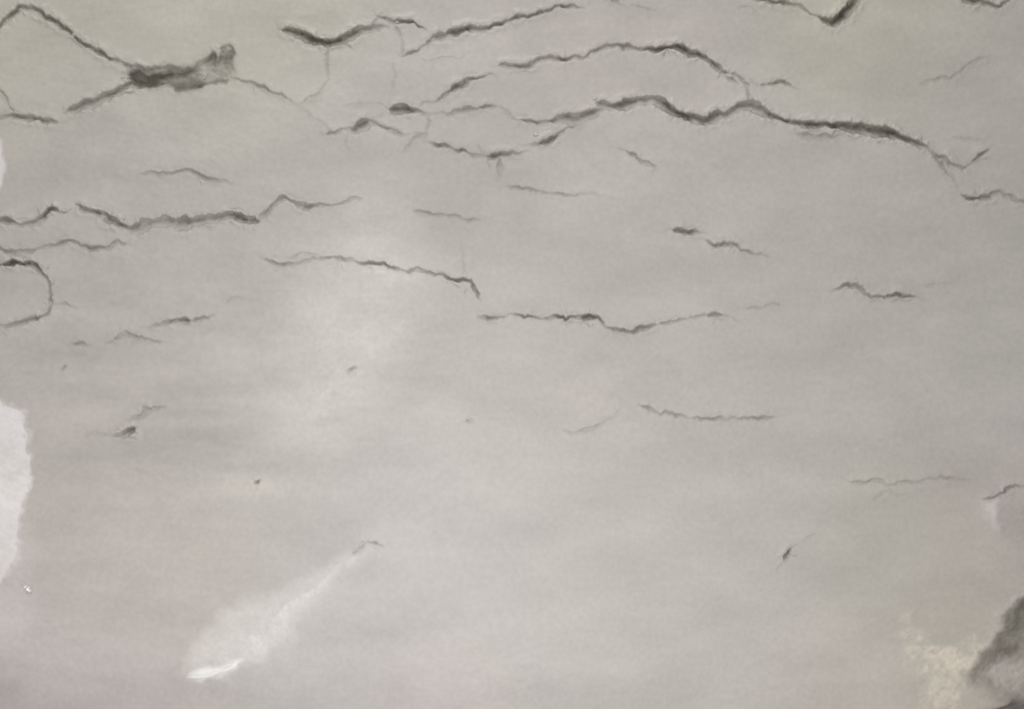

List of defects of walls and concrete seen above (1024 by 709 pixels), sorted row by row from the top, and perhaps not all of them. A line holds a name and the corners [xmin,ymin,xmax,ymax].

crack [0,0,1024,351]
peeling [0,396,52,663]
crack [553,399,794,438]
spalling [883,574,1024,709]